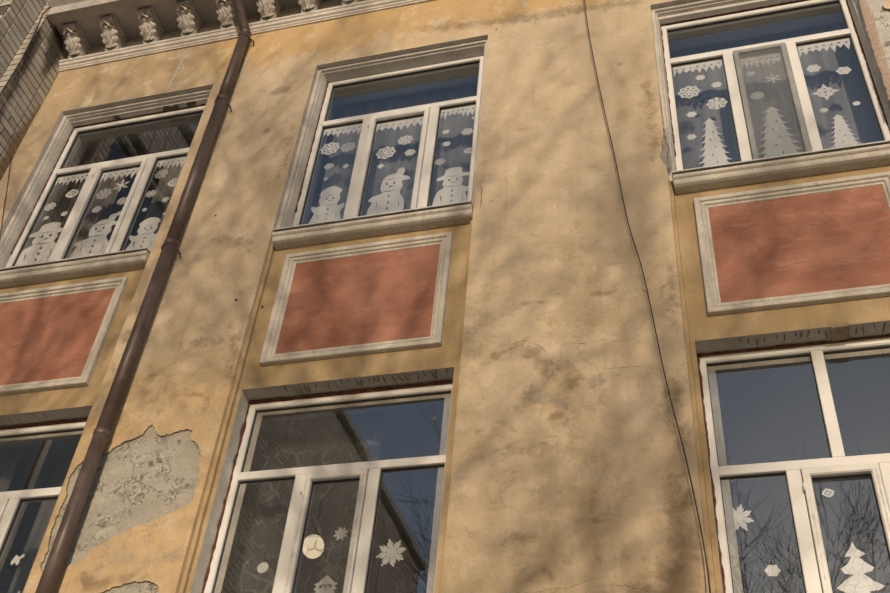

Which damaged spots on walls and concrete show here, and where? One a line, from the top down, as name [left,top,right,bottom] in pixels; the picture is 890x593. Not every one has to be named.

flaking render [859,0,890,100]
spalling [40,461,83,572]
spalling [61,425,201,571]
spalling [101,580,159,593]